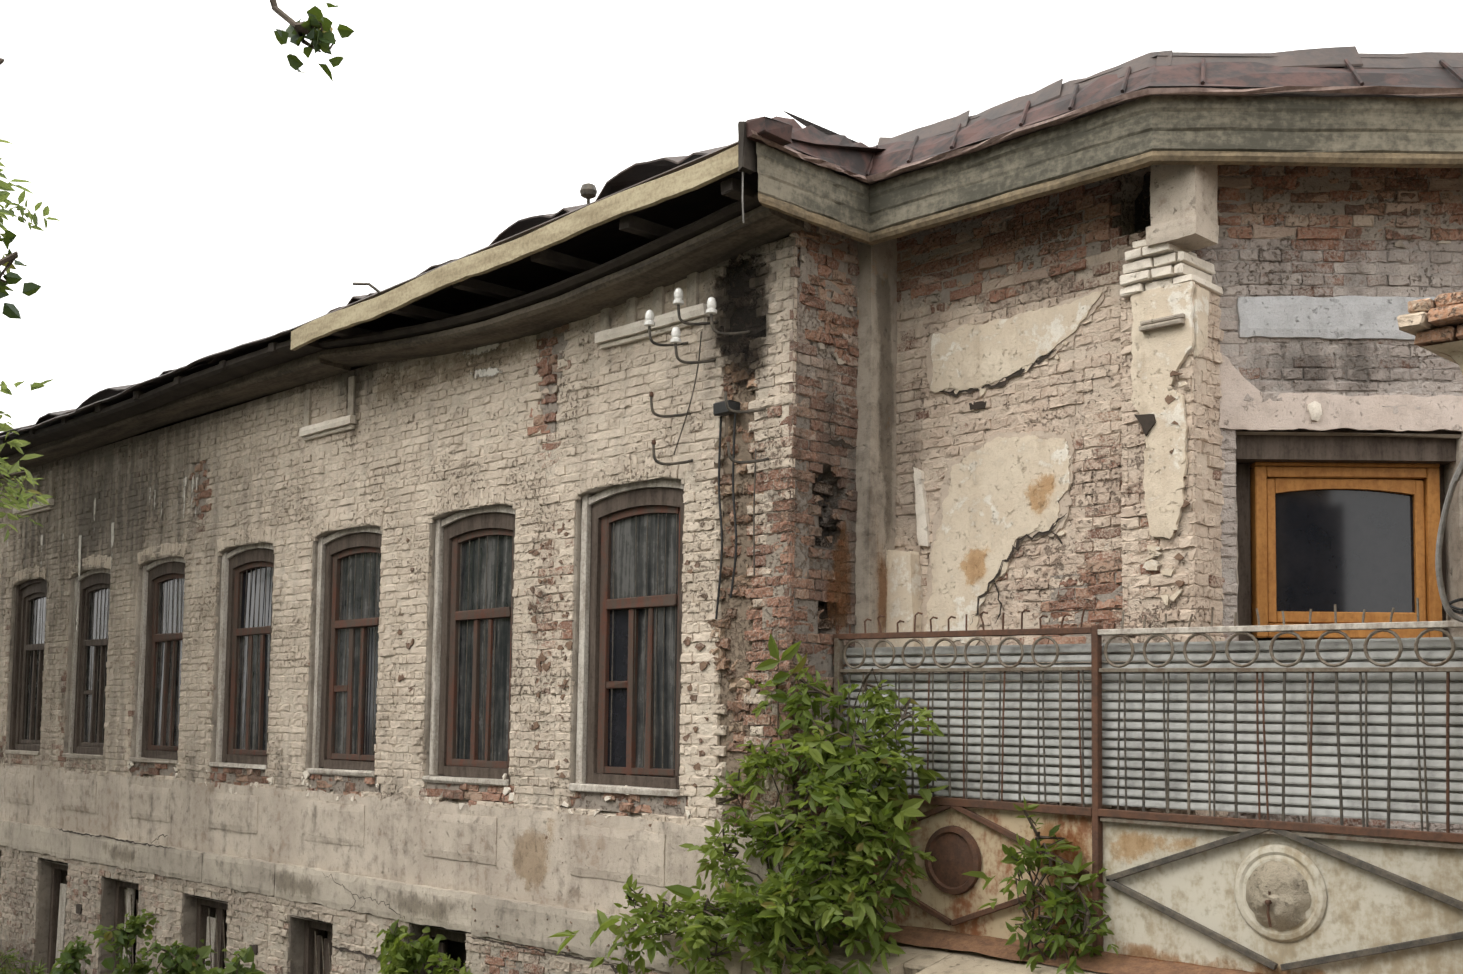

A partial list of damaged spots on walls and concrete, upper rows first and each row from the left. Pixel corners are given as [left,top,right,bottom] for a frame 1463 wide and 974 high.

spalling [1133,171,1151,242]
spalling [1217,165,1463,248]
spalling [898,176,1122,410]
spalling [527,324,572,450]
spalling [188,456,212,520]
flaking render [886,430,1075,655]
crack [970,513,1067,625]
spalling [1032,558,1123,653]
flaking render [1130,281,1209,606]